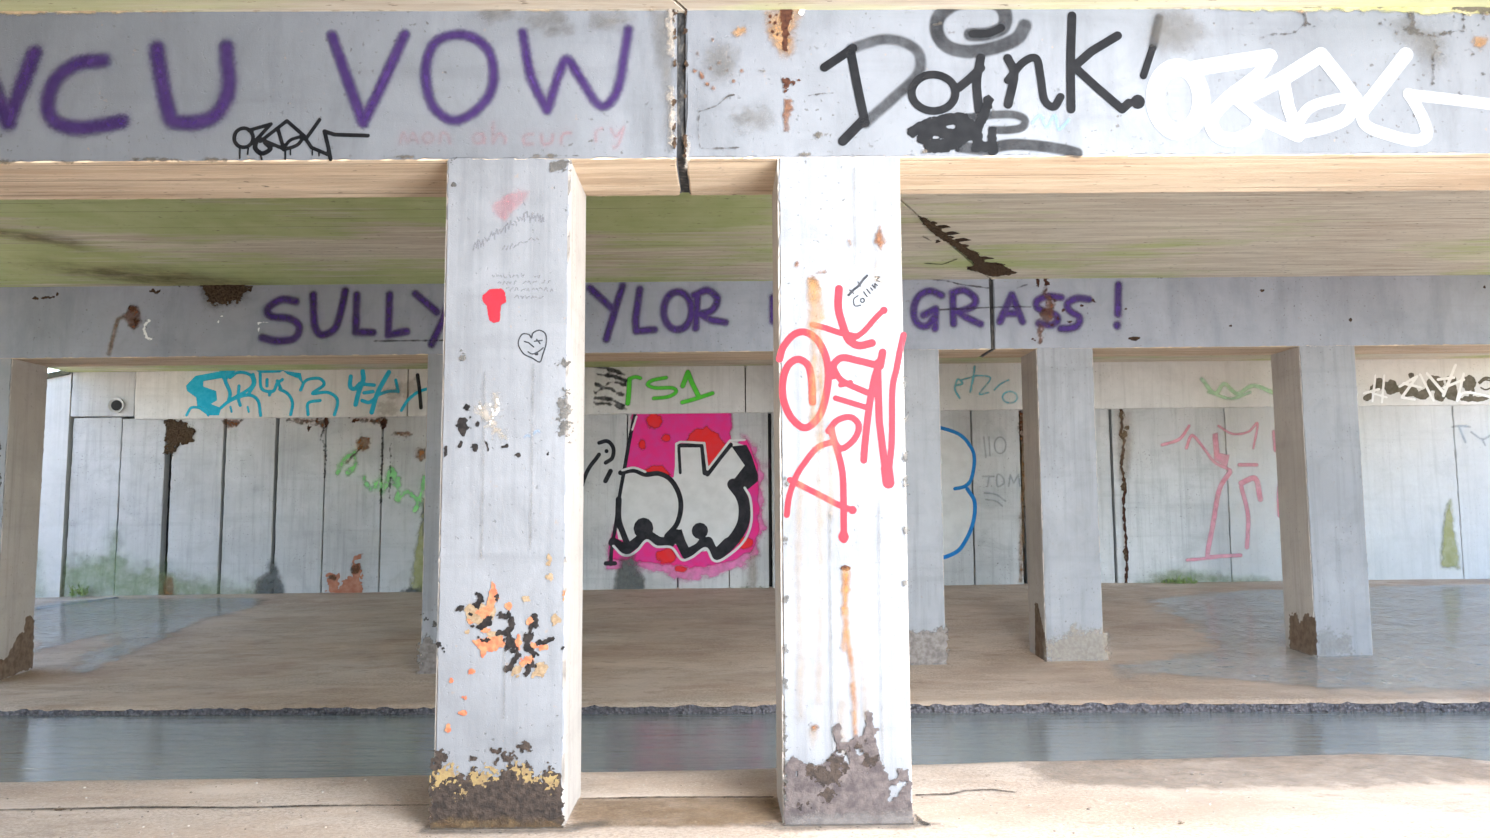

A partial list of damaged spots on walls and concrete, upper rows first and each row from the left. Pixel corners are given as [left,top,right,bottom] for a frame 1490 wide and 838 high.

corrosion [768,9,805,54]
corrosion [782,77,801,131]
spalling [179,285,253,323]
spalling [162,419,196,456]
corrosion [841,565,853,664]
peeling [1289,613,1318,657]
peeling [414,553,565,830]
peeling [782,710,914,826]